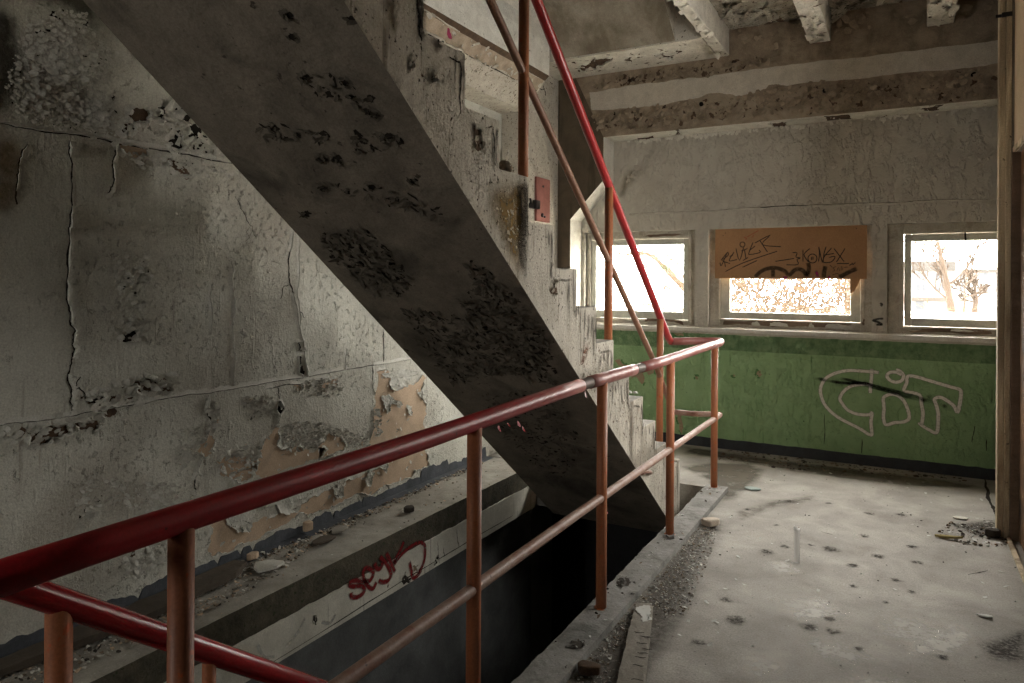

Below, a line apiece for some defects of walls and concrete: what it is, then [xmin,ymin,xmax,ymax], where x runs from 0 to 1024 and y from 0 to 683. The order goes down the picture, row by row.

flaking render [111,98,226,180]
peeling [255,122,344,167]
peeling [296,69,404,154]
peeling [314,177,443,221]
peeling [553,0,998,139]
crack [0,117,411,427]
peeling [320,227,559,387]
peeling [196,366,429,486]
peeling [207,450,429,560]